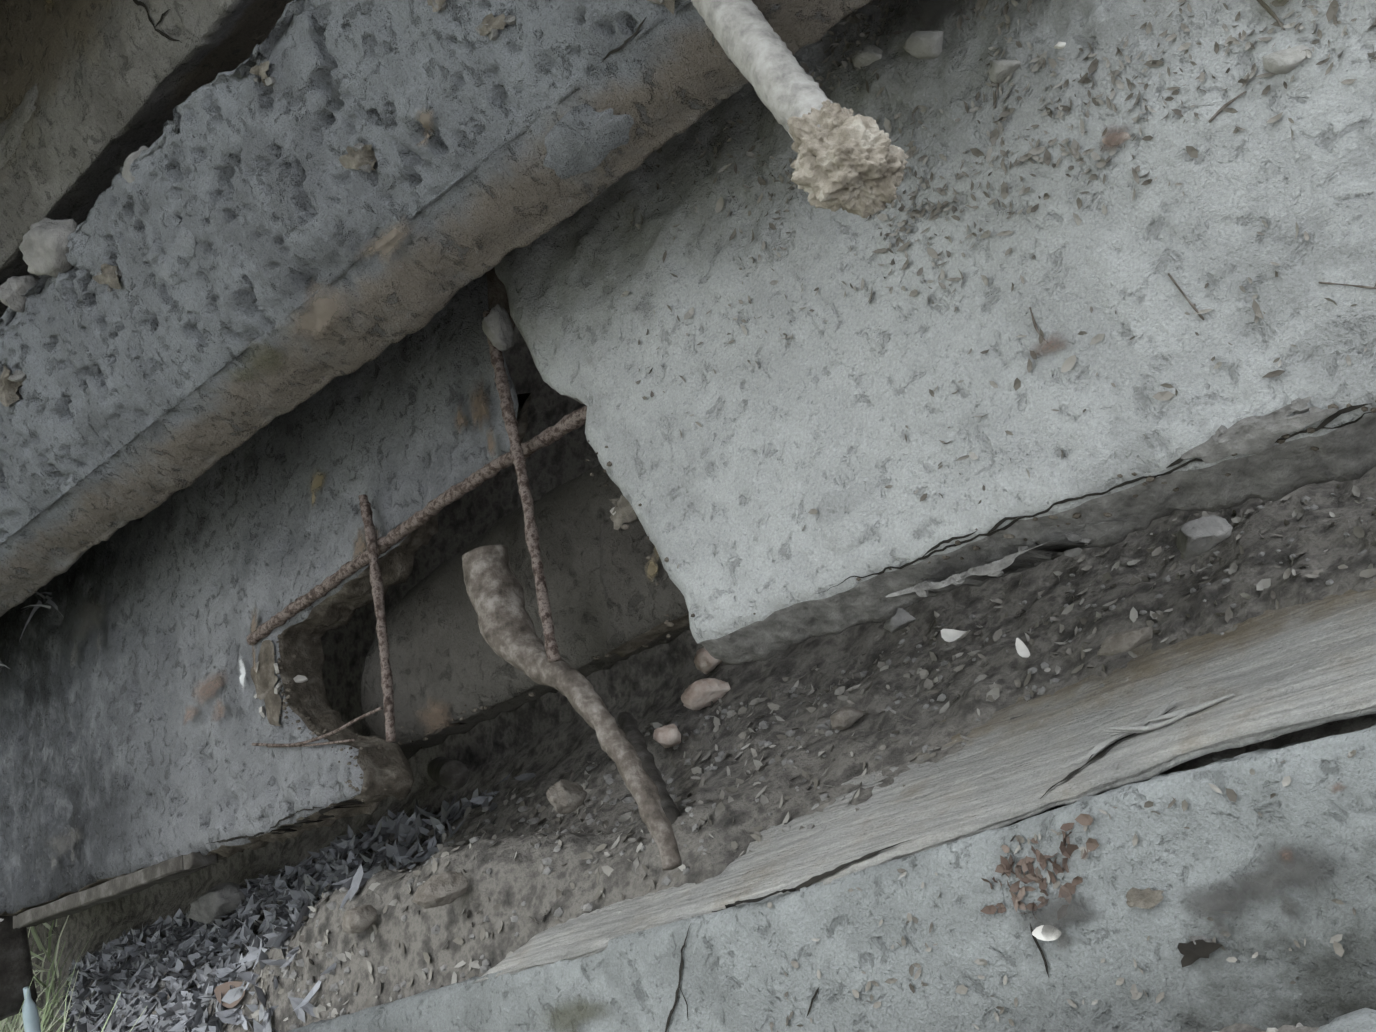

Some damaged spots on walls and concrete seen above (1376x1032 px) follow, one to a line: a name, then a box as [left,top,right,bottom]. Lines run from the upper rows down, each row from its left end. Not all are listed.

crack [133,0,182,43]
spalling [609,495,637,530]
spalling [250,640,308,726]
crack [665,840,909,1032]